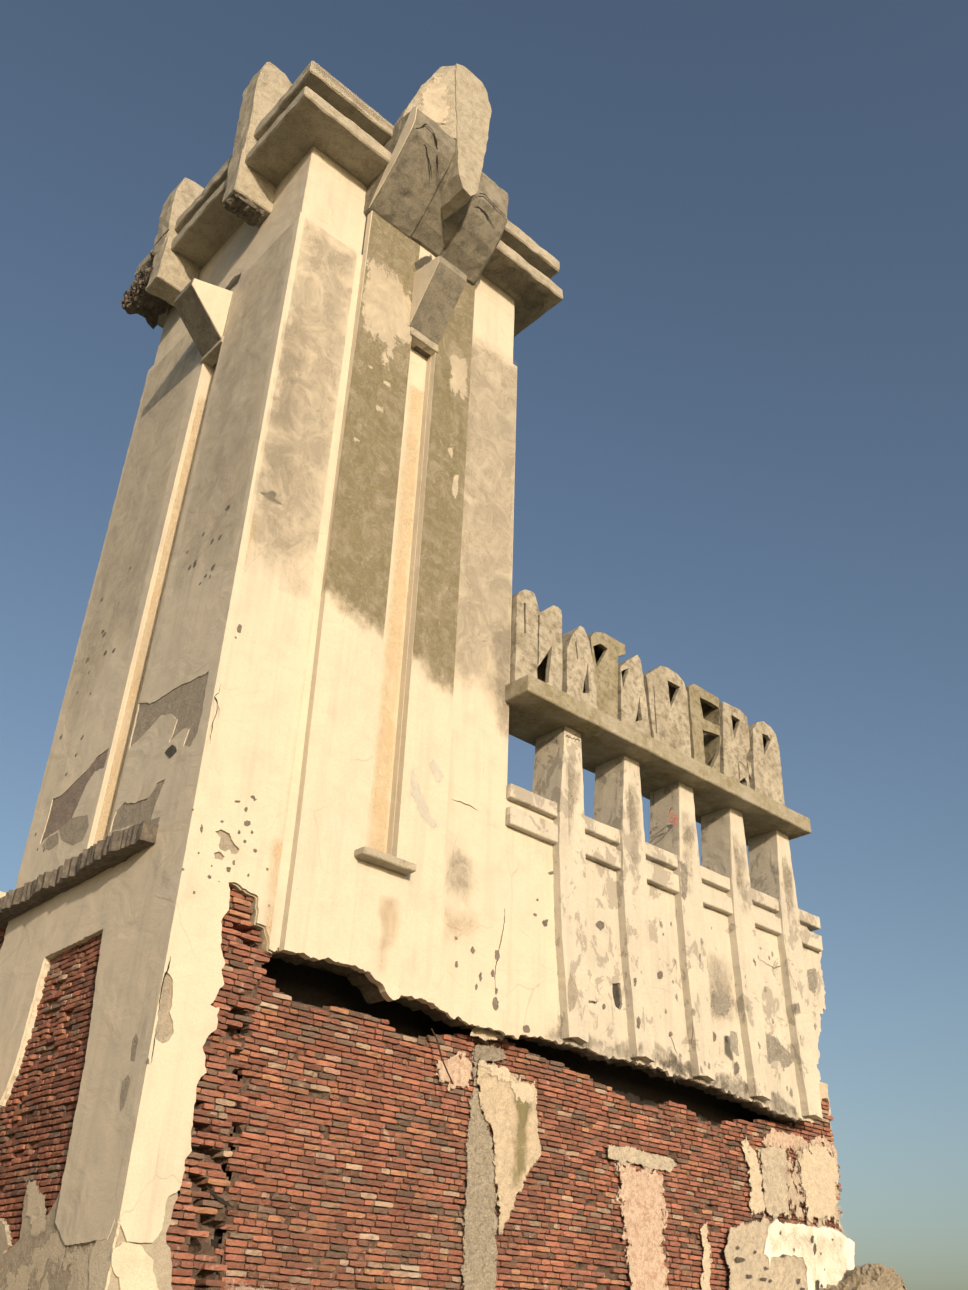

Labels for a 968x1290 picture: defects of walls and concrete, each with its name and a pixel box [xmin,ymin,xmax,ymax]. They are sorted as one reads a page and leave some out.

spalling [121,248,170,329]
damp [270,238,351,549]
damp [458,347,517,715]
flaking render [130,672,209,759]
flaking render [35,749,109,852]
flaking render [111,780,165,831]
flaking render [0,795,843,1290]